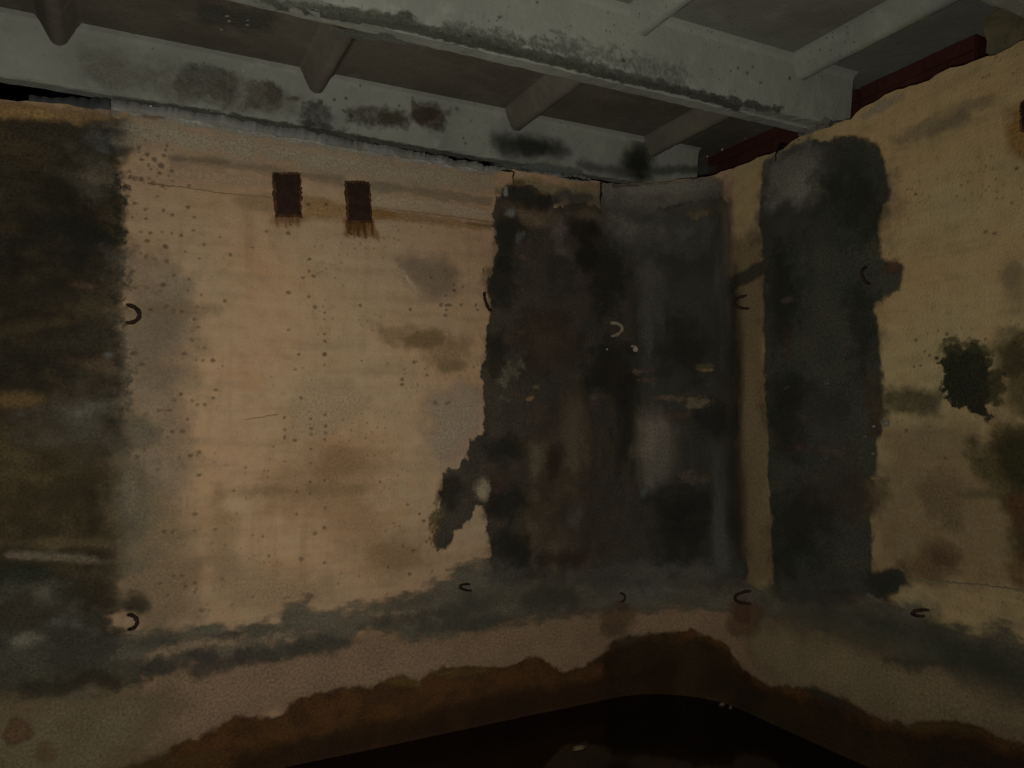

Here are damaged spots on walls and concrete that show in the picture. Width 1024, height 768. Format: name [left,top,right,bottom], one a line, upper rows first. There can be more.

leakage [89,59,482,161]
mould [200,0,783,113]
corrosion [344,209,492,239]
leakage [0,111,1024,699]
leakage [128,629,1024,768]